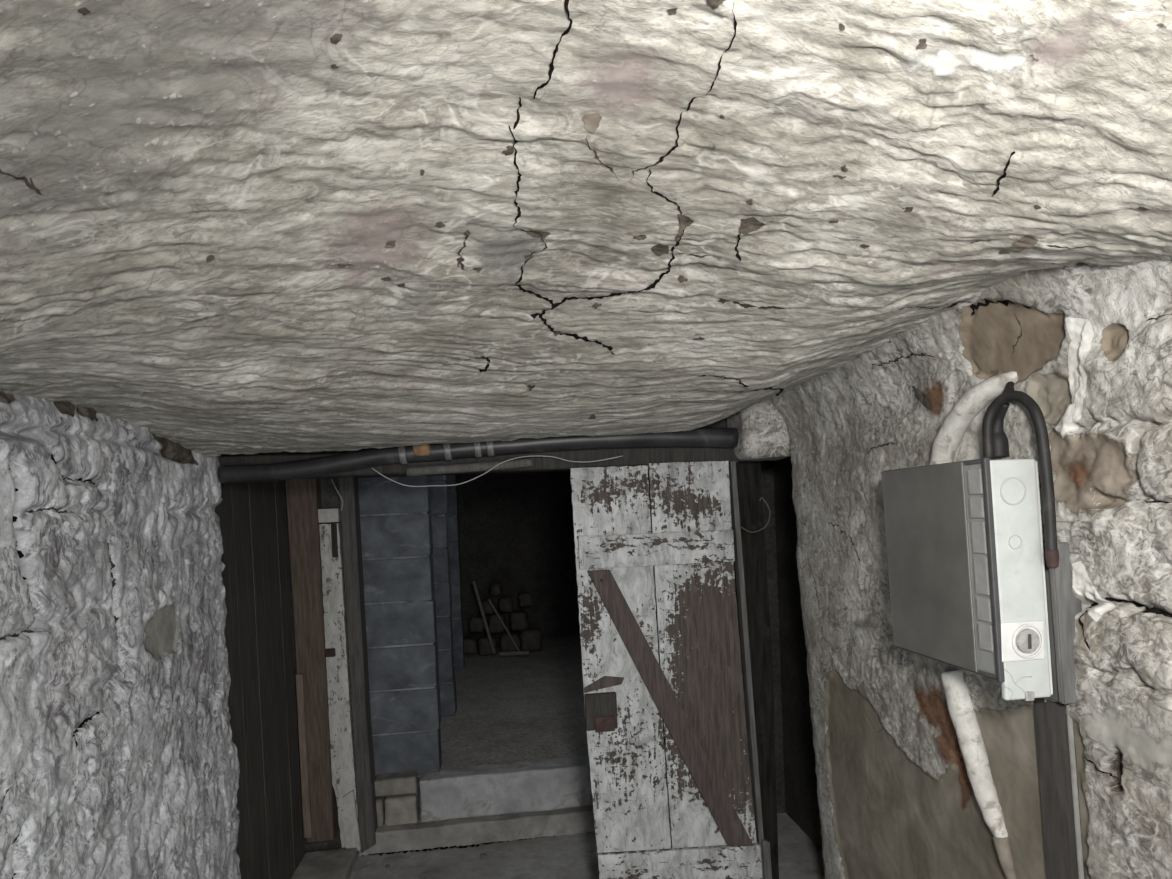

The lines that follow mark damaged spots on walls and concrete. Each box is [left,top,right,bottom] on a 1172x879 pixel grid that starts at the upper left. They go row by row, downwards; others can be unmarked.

crack [0,169,43,195]
crack [509,0,737,355]
crack [992,151,1015,197]
crack [457,235,469,271]
crack [719,298,791,309]
crack [697,375,783,396]
flaking render [958,298,1137,515]
flaking render [144,601,179,660]
crack [1079,597,1172,650]